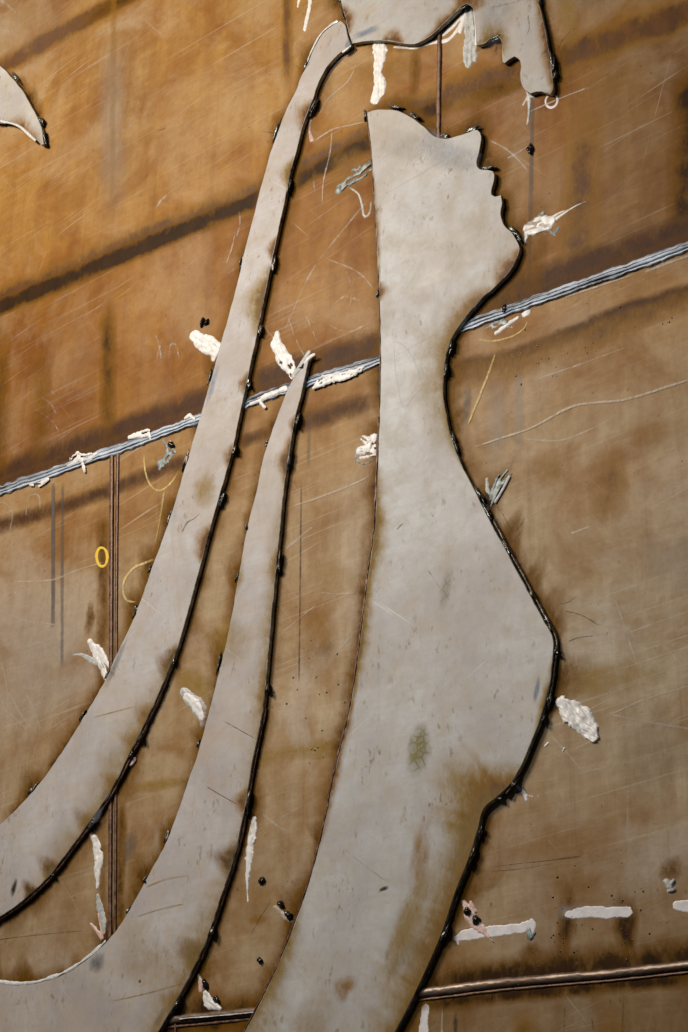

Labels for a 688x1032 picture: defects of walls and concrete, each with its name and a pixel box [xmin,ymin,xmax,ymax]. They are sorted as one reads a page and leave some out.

rust [372,57,522,139]
rust [537,0,688,99]
rust [0,179,263,315]
rust [241,79,380,480]
rust [433,73,688,520]
rust [0,312,217,486]
rust [0,409,282,945]
rust [295,424,384,856]
rust [6,966,63,982]
rust [154,872,309,1032]
rust [384,747,688,1032]